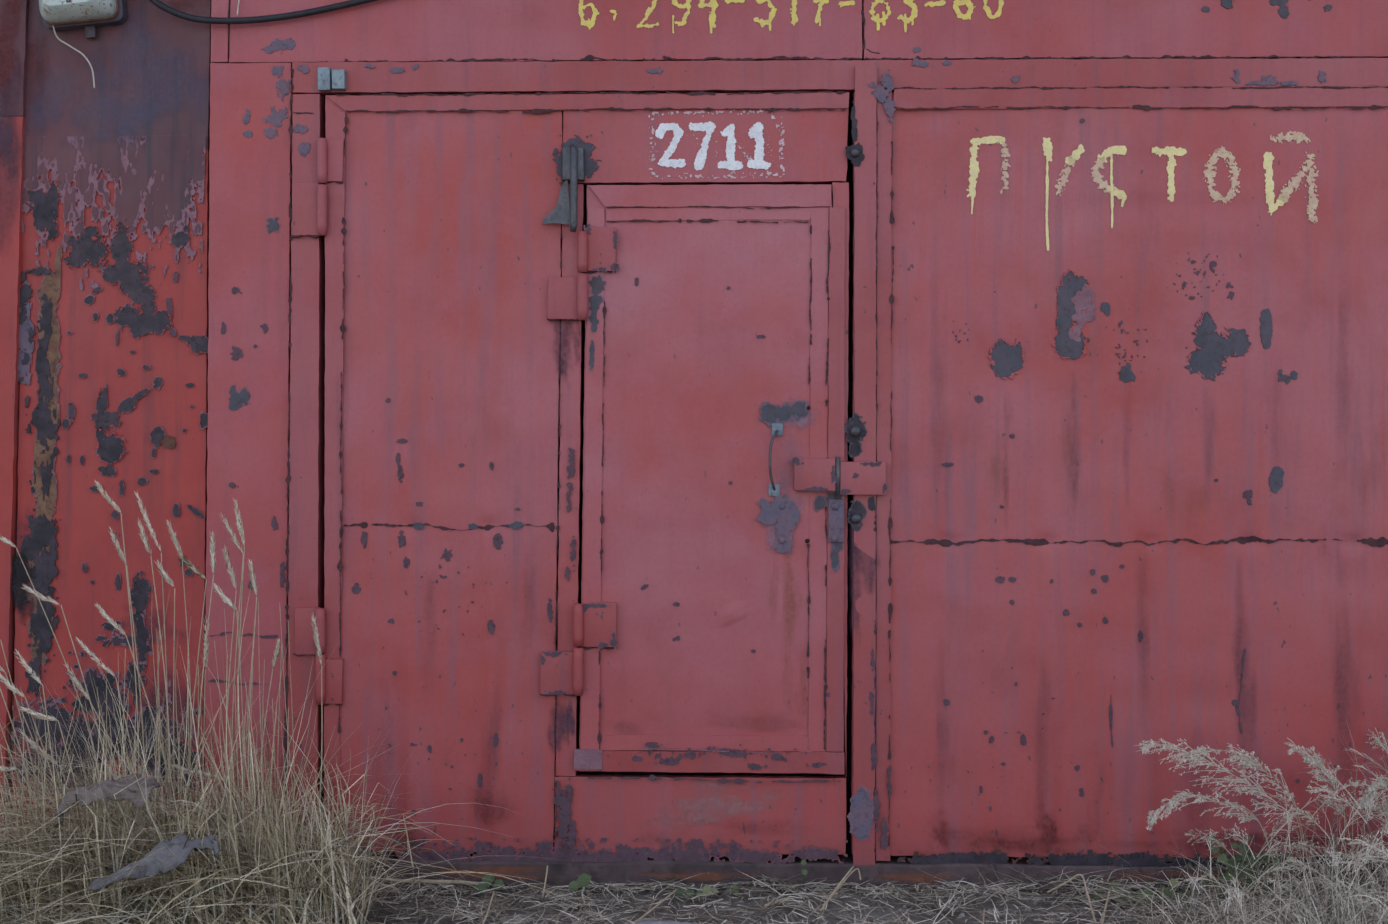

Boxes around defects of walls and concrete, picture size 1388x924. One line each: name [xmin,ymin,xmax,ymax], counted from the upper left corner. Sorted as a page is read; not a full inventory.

peeling [1201,0,1234,12]
peeling [1269,0,1290,19]
peeling [1052,269,1148,383]
peeling [1167,252,1273,381]
peeling [988,338,1025,380]
peeling [759,400,809,427]
peeling [9,135,269,806]
peeling [756,413,887,572]
peeling [619,742,826,770]